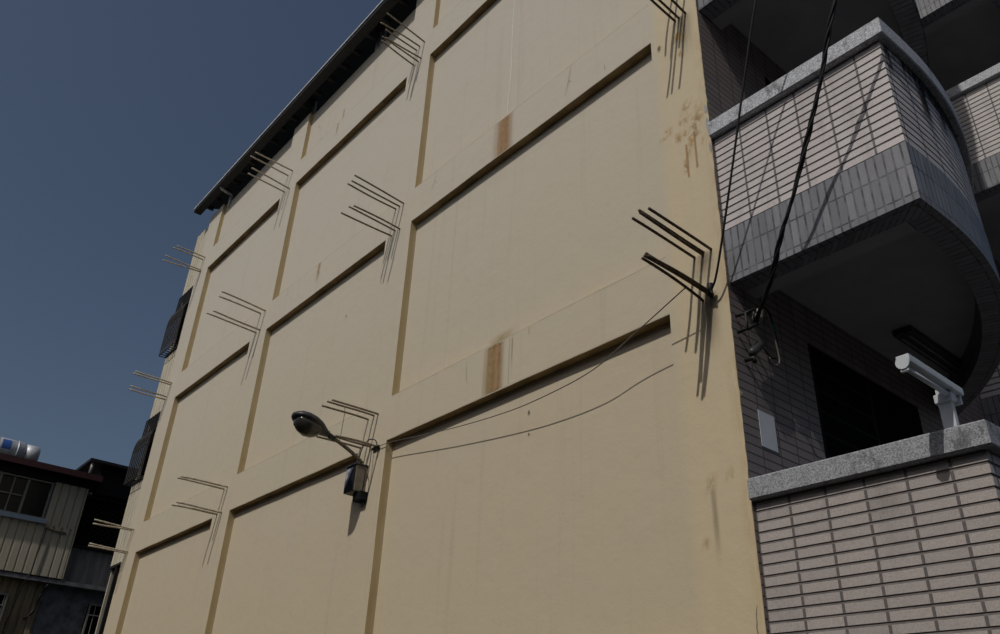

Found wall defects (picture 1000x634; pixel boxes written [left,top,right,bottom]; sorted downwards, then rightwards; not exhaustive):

corrosion [497,115,509,155]
corrosion [677,108,700,177]
corrosion [485,342,500,394]